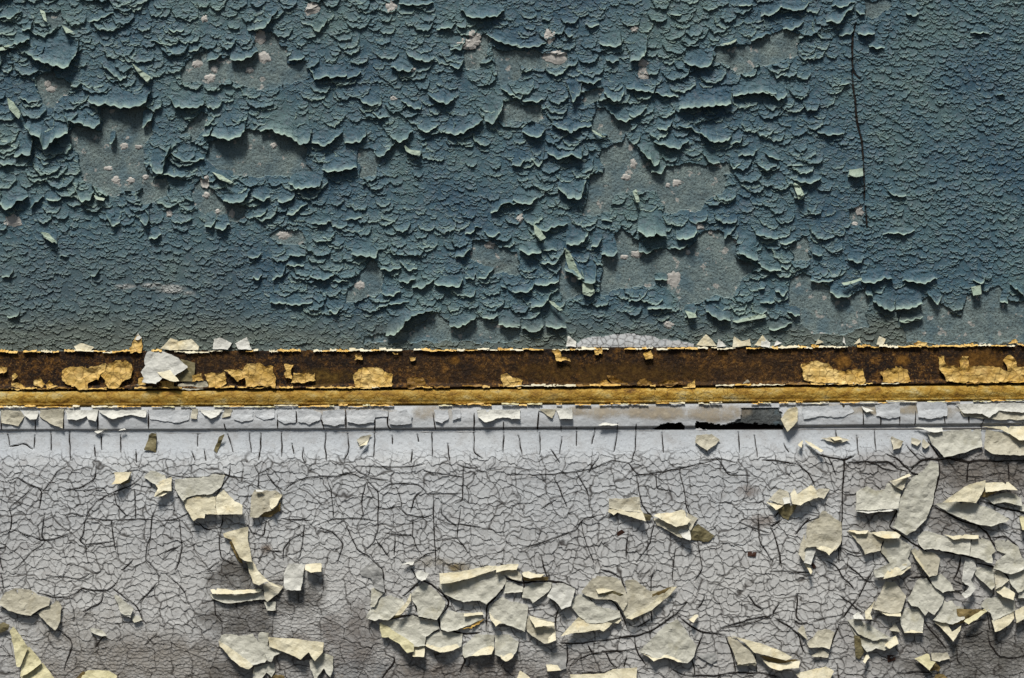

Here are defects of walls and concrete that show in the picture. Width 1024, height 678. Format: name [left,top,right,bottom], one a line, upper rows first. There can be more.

crack [851,23,868,226]
peeling [0,0,1024,390]
peeling [144,471,322,611]
crack [0,407,1024,678]
peeling [608,497,714,542]
peeling [653,399,1024,663]
peeling [0,588,62,678]
peeling [218,632,333,678]
peeling [360,561,677,678]
peeling [639,615,717,664]
peeling [727,625,834,678]
peeling [915,653,950,678]